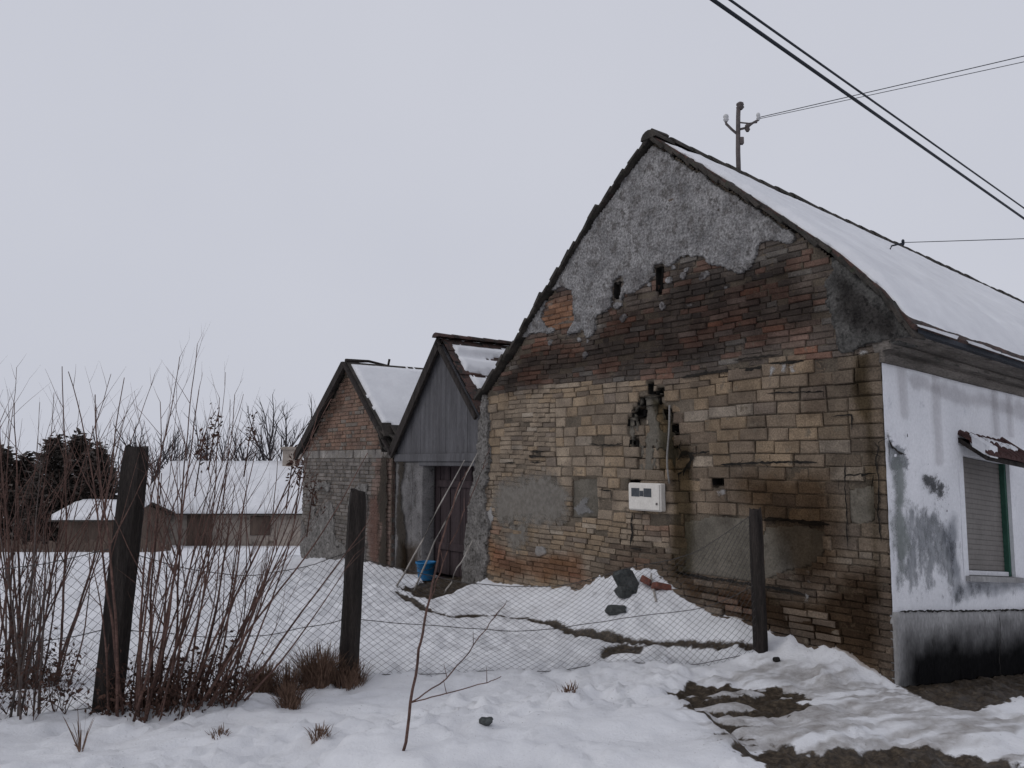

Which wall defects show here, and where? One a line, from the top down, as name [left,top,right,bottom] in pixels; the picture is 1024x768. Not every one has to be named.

flaking render [522,146,797,359]
spalling [628,383,680,432]
leakage [898,474,989,602]